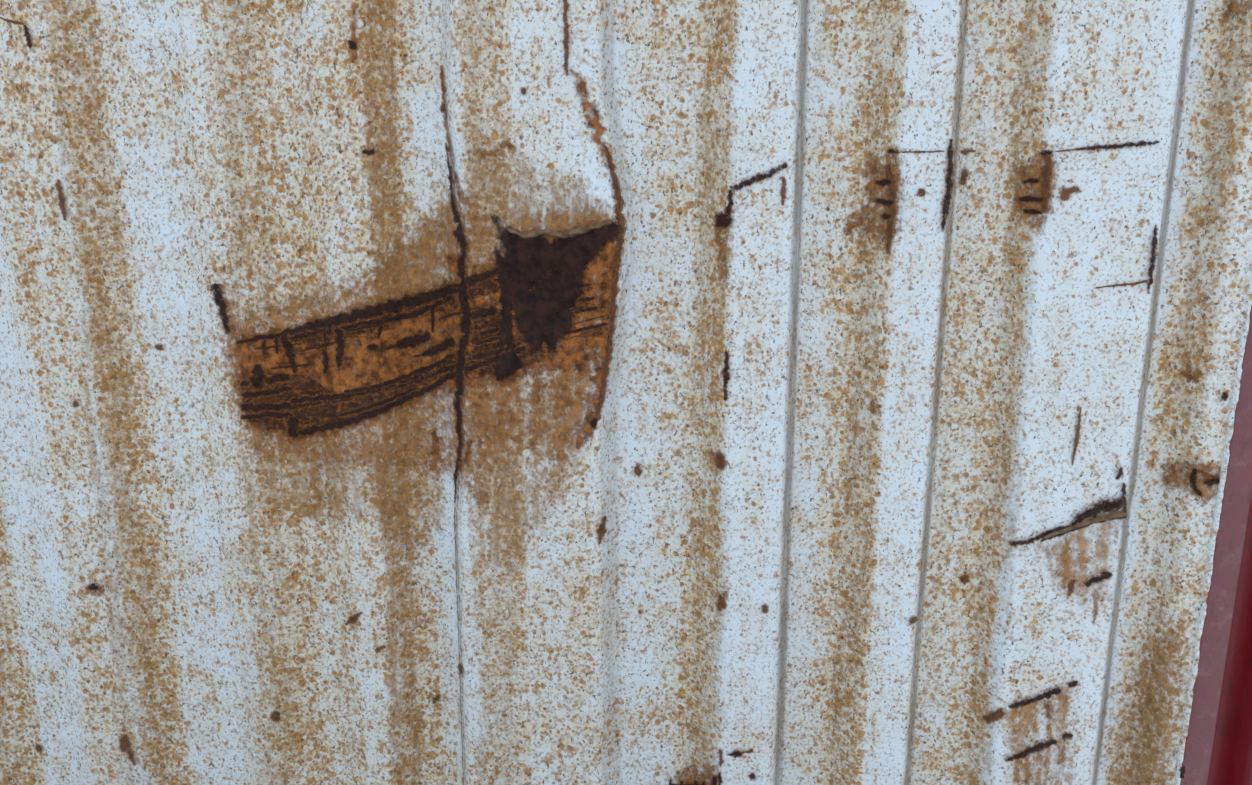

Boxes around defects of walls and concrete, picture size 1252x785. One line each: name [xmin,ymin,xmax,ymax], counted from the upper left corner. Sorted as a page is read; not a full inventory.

rust [347,0,401,271]
crack [563,0,627,449]
rust [844,148,926,254]
rust [1015,155,1080,229]
crack [445,144,474,785]
rust [1162,462,1221,507]
rust [1046,523,1117,624]
rust [669,765,722,785]
rust [982,686,1072,785]